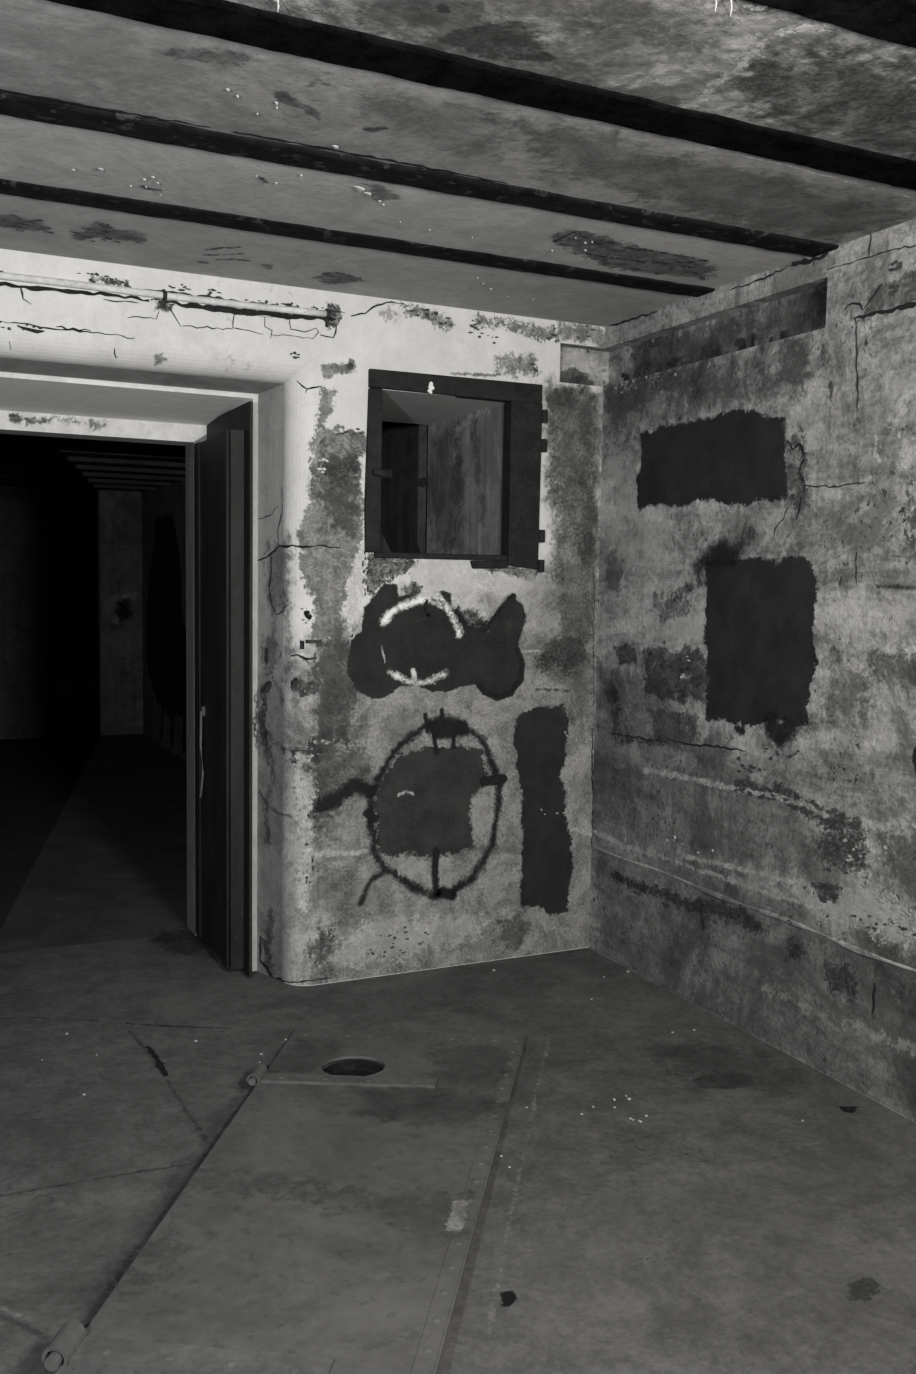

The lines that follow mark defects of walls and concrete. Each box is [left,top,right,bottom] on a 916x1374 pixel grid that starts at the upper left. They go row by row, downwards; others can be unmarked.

crack [0,282,344,358]
peeling [313,272,363,285]
damp [543,287,833,592]
peeling [291,301,716,985]
damp [525,636,589,692]
damp [564,671,916,1118]